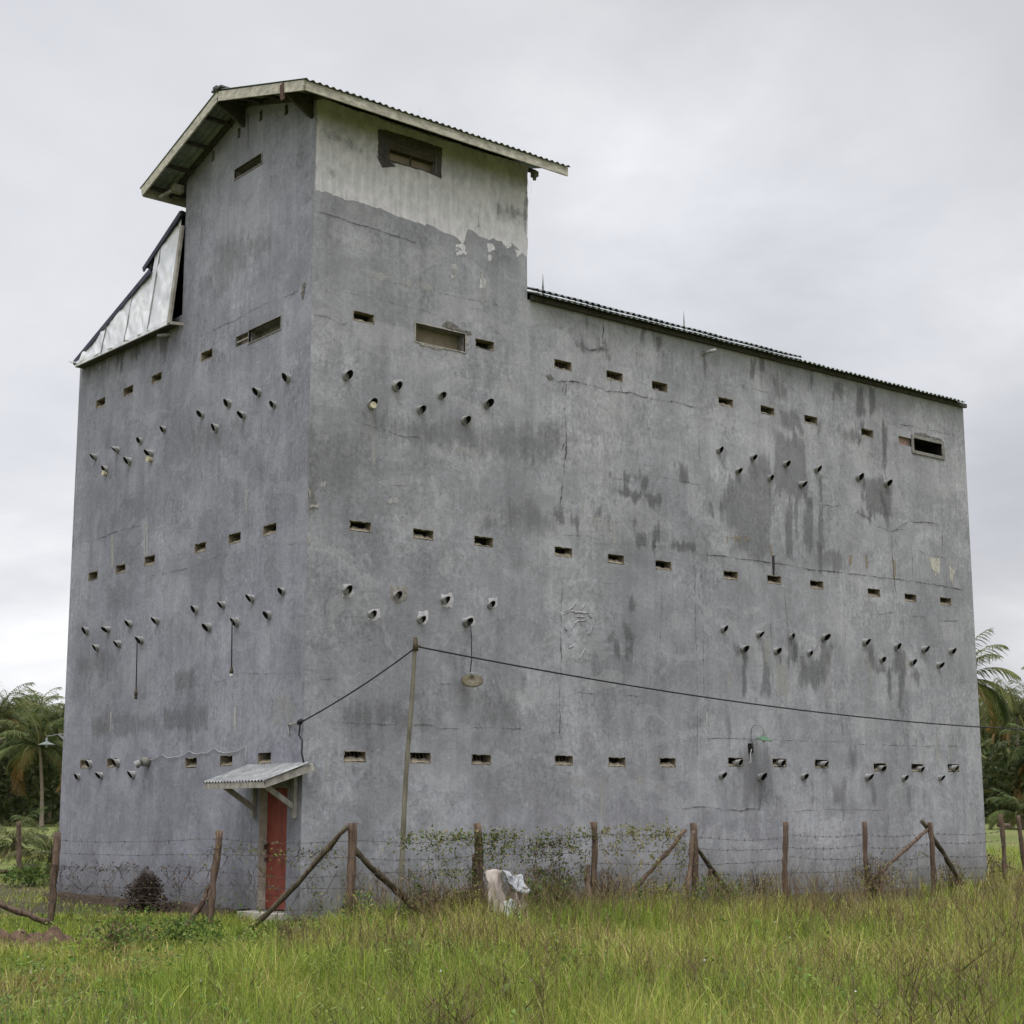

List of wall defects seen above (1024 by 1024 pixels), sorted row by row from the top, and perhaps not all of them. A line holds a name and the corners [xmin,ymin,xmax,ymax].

peeling [315,99,528,278]
water stain [857,388,875,442]
water stain [619,472,661,505]